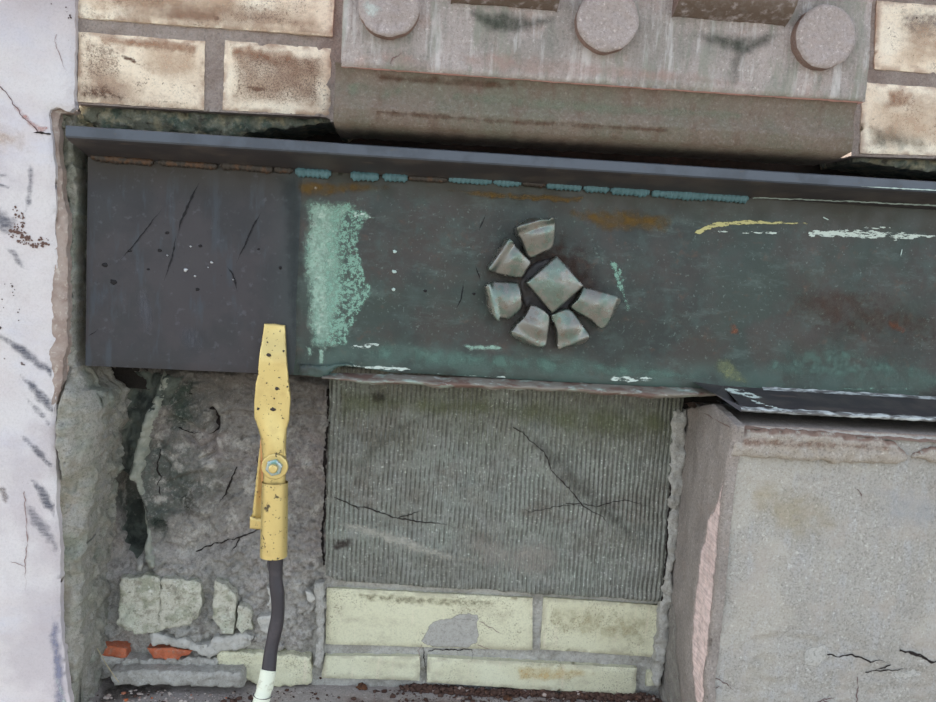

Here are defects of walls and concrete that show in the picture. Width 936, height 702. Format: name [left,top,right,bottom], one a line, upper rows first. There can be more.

crack [0,86,51,135]
damp [303,184,371,363]
crack [513,427,646,540]
crack [334,497,454,528]
crack [196,529,258,552]
spalling [102,553,271,660]
spalling [422,613,479,648]
spalling [217,648,264,684]
spalling [274,648,313,687]
crack [827,649,936,702]